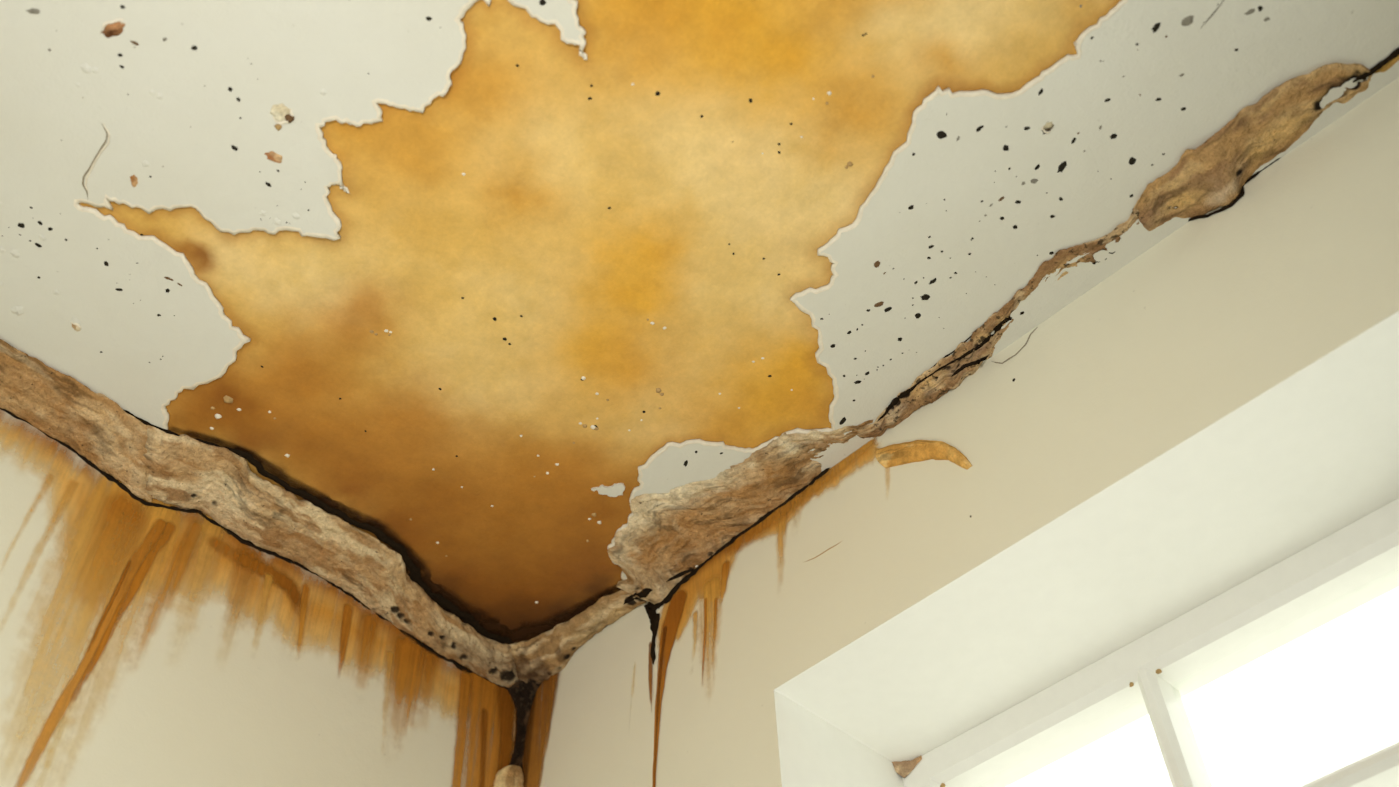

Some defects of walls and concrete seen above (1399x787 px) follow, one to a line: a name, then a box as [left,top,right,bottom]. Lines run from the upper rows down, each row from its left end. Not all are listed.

crack [0,408,541,771]
water stain [0,412,559,787]
crack [124,410,830,664]
water stain [8,0,1128,643]
spalling [0,209,1139,688]
water stain [648,439,877,787]
crack [877,311,1037,422]
crack [1188,157,1281,221]
crack [1353,47,1399,83]